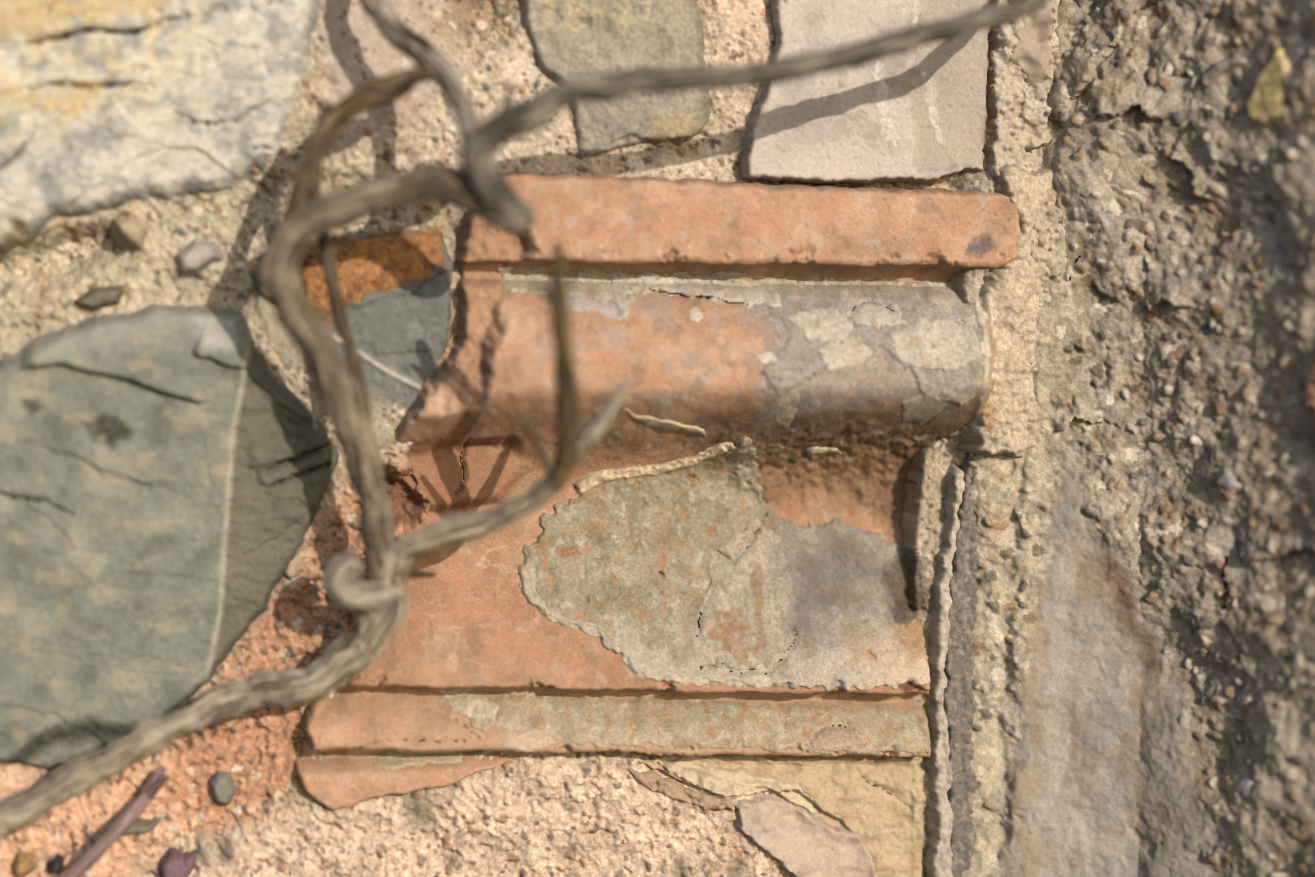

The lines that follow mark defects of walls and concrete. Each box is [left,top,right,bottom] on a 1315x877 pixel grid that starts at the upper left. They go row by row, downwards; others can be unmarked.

peeling [395,212,997,455]
peeling [437,409,932,877]